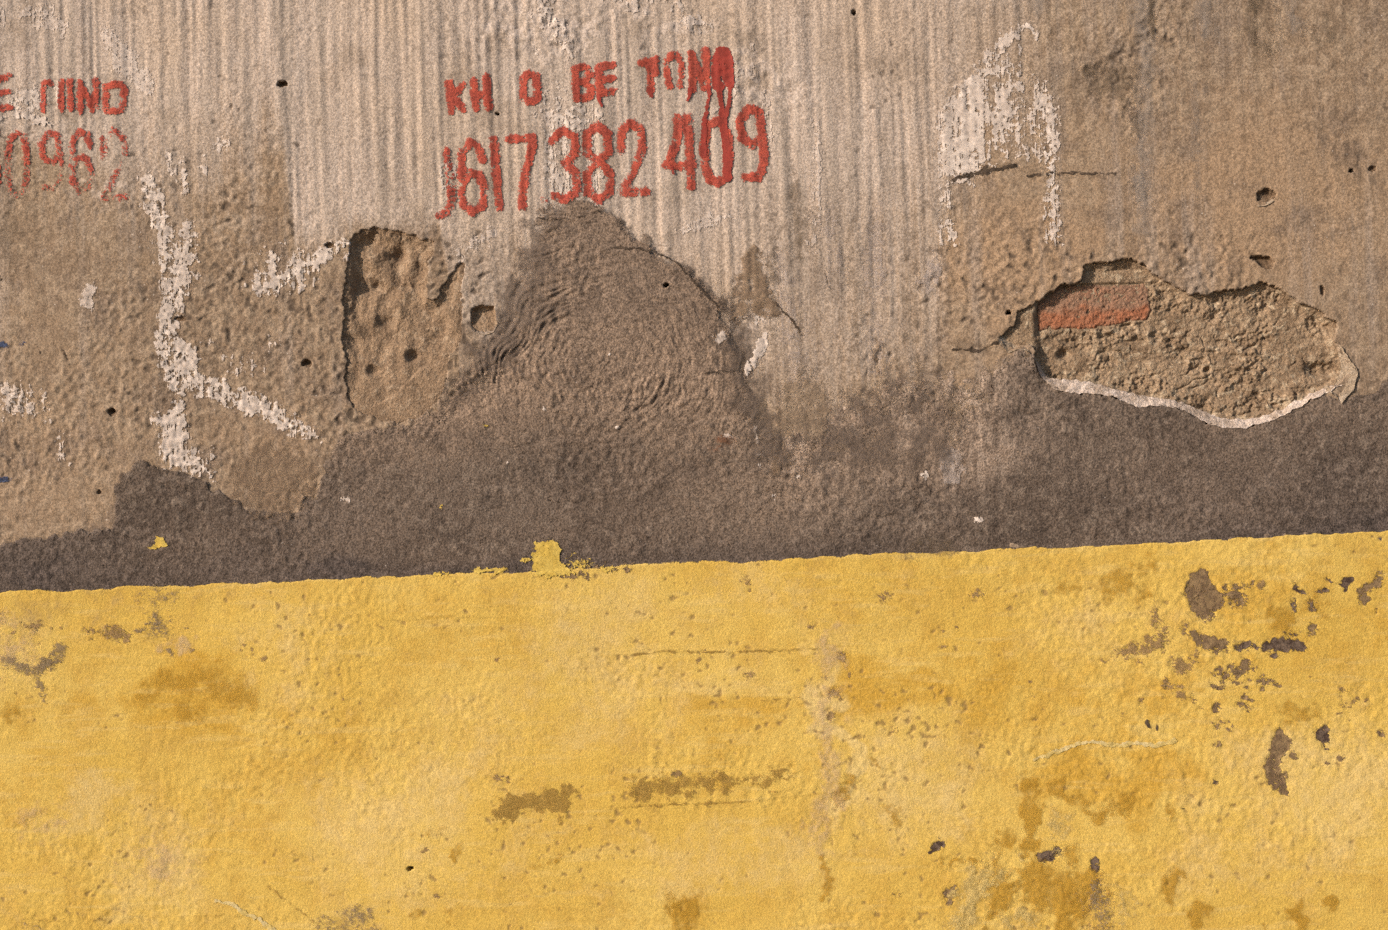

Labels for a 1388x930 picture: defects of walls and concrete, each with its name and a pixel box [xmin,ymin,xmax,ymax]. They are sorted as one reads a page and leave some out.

water stain [163,259,201,314]
flaking render [325,227,497,423]
flaking render [997,255,1358,429]
water stain [256,393,285,419]
peeling [1100,564,1384,747]
peeling [1263,728,1298,796]
peeling [1315,687,1368,765]